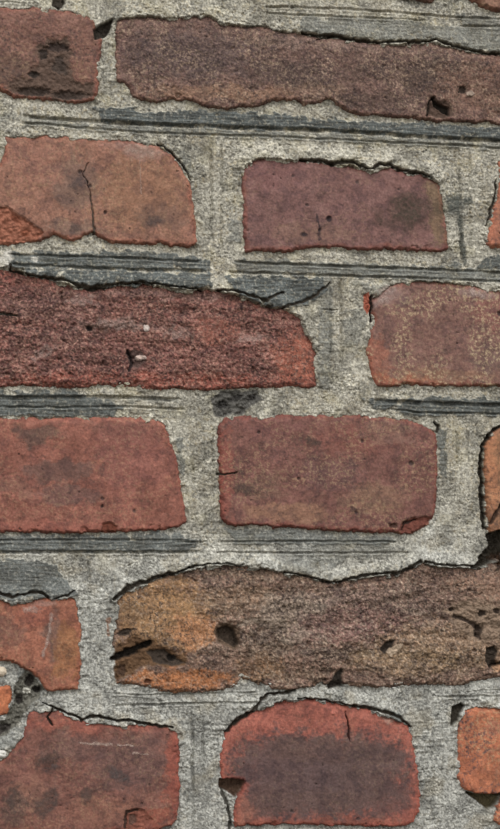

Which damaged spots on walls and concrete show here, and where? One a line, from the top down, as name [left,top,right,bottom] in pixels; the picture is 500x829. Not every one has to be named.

crack [82,165,96,235]
crack [9,264,330,309]
spalling [109,628,190,683]
crack [42,702,174,729]
crack [224,689,411,740]